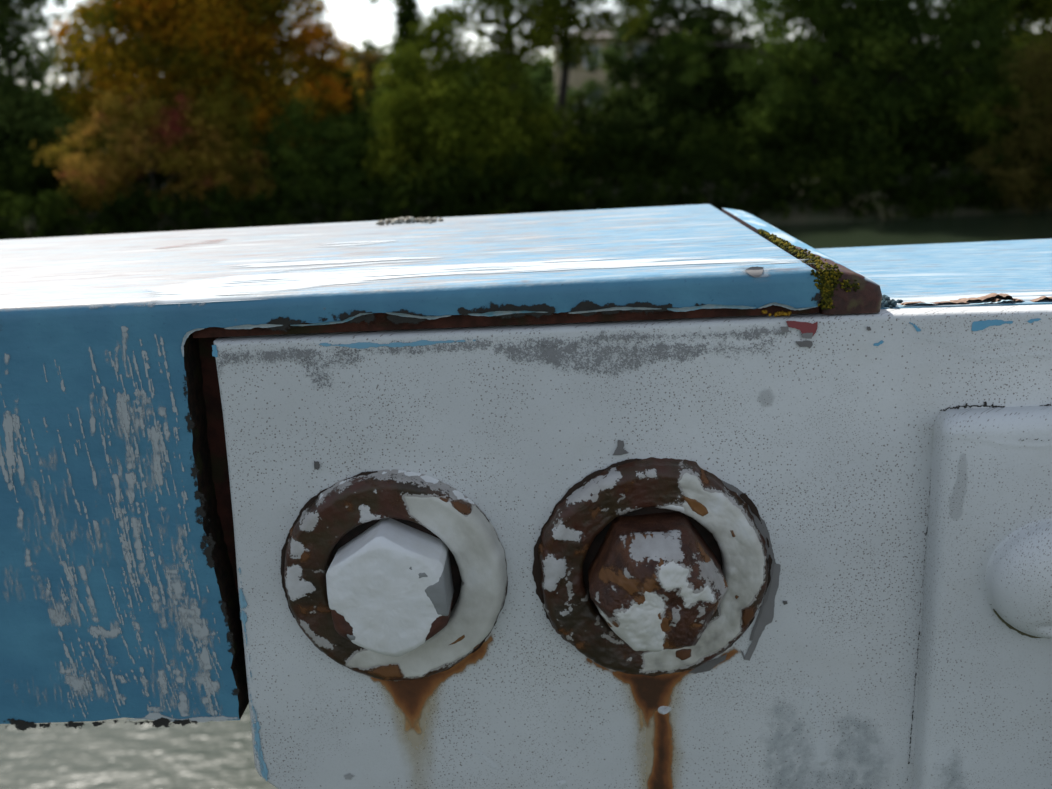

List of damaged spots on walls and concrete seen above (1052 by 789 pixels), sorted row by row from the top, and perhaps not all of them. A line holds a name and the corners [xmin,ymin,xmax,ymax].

peeling [181,328,205,357]
peeling [190,457,215,568]
rust [198,337,239,595]
peeling [4,719,51,731]
peeling [64,713,238,729]
rust [370,636,493,743]
rust [586,658,694,789]